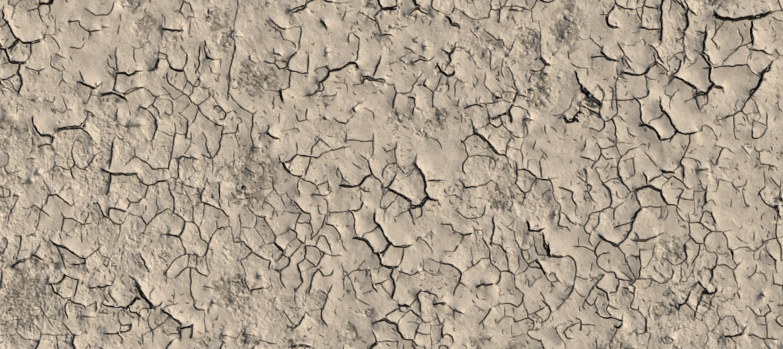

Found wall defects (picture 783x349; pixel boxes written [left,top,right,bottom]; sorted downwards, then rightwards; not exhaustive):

crack [161,16,190,42]
crack [359,0,408,37]
crack [0,0,109,118]
crack [31,110,100,179]
crack [0,153,76,224]
crack [716,178,764,216]
crack [11,220,46,269]